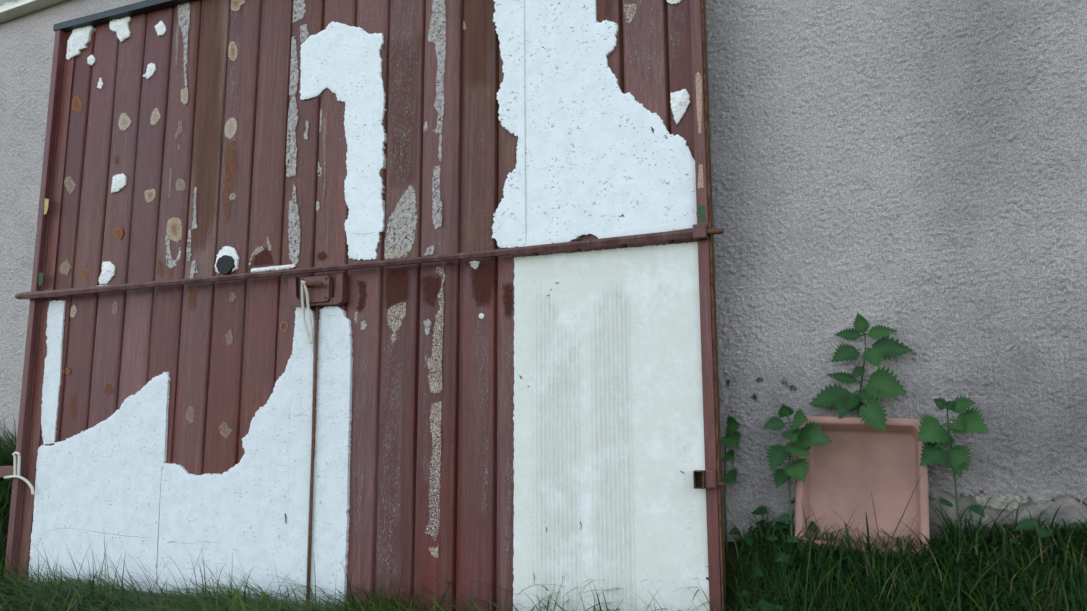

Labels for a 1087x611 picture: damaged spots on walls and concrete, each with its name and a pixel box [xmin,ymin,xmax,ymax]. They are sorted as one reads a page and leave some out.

peeling [165,187,198,278]
peeling [286,0,326,265]
peeling [352,0,446,585]
flaking render [973,491,1029,511]